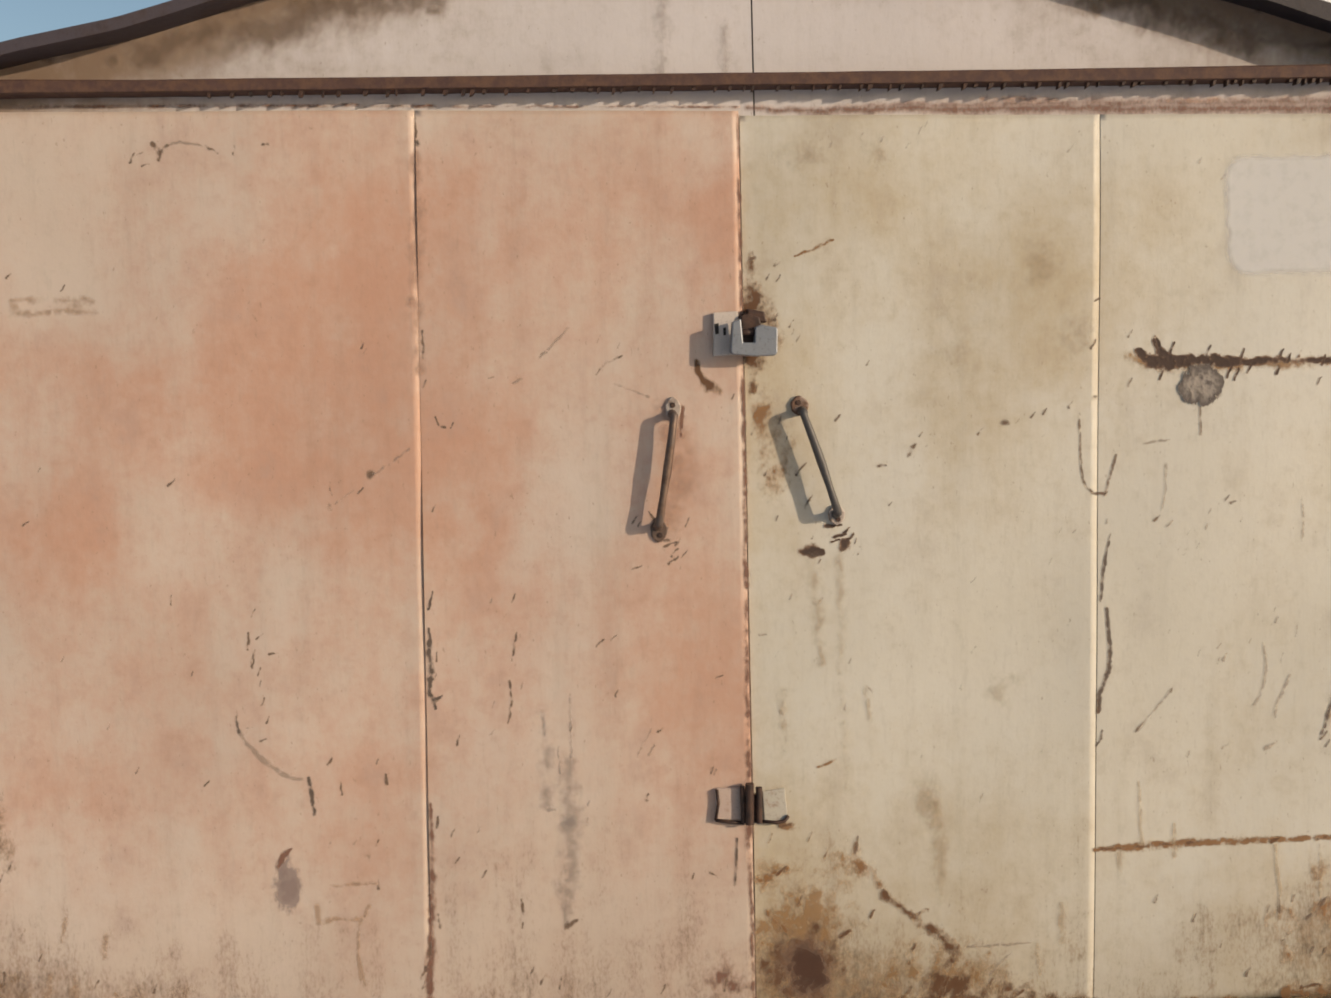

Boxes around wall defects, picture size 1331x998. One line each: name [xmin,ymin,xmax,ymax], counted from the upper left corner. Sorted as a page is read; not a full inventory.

leakage [136,0,442,67]
leakage [1078,0,1331,56]
rust [738,179,794,341]
rust [1128,330,1331,384]
rust [694,356,788,783]
rust [1093,834,1331,852]
rust [421,803,455,998]
rust [706,864,861,998]
rust [824,836,1058,998]
rust [1266,894,1331,922]
rust [1280,983,1331,998]